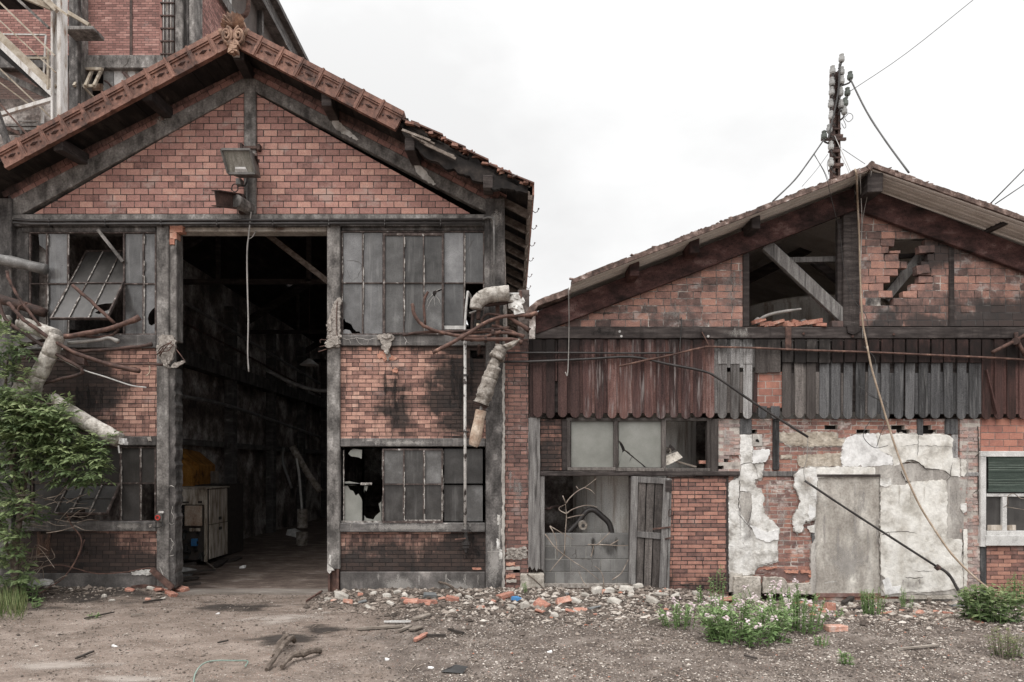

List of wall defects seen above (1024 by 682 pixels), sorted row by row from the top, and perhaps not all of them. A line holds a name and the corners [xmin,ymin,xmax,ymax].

peeling [728,430,968,596]